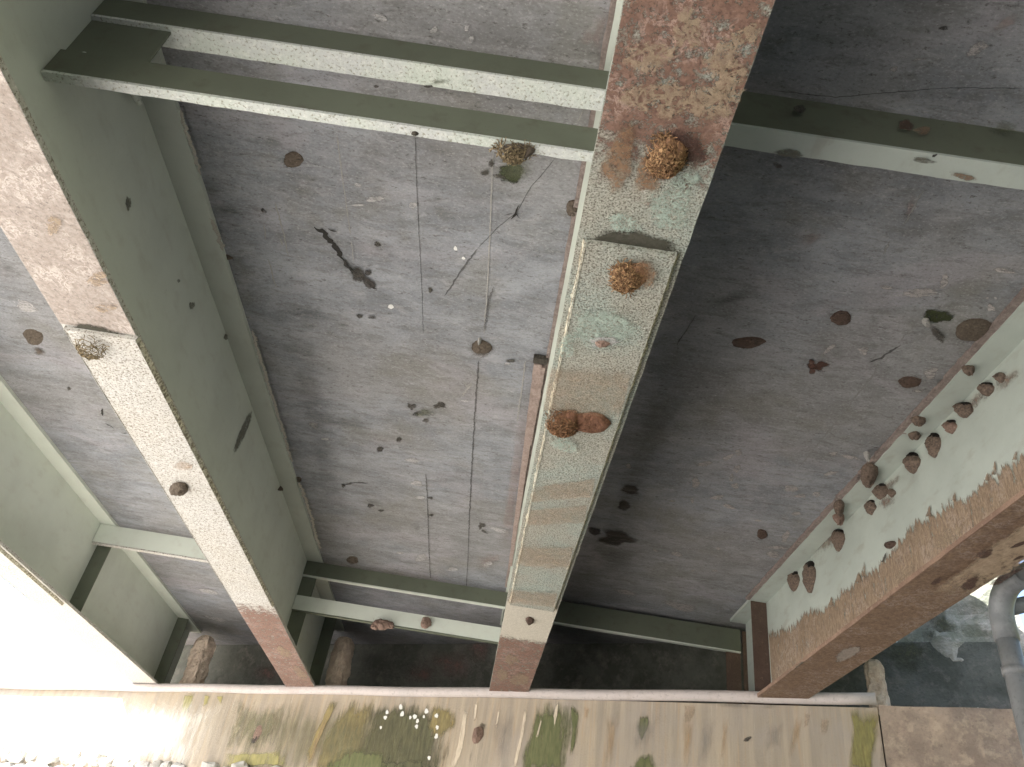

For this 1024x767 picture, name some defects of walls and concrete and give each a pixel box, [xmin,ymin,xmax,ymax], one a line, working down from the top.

rust [594,0,775,199]
crack [415,138,553,330]
rust [238,604,314,687]
crack [466,361,479,586]
rust [489,635,546,692]
rust [749,451,1024,706]
peeling [931,525,1024,595]